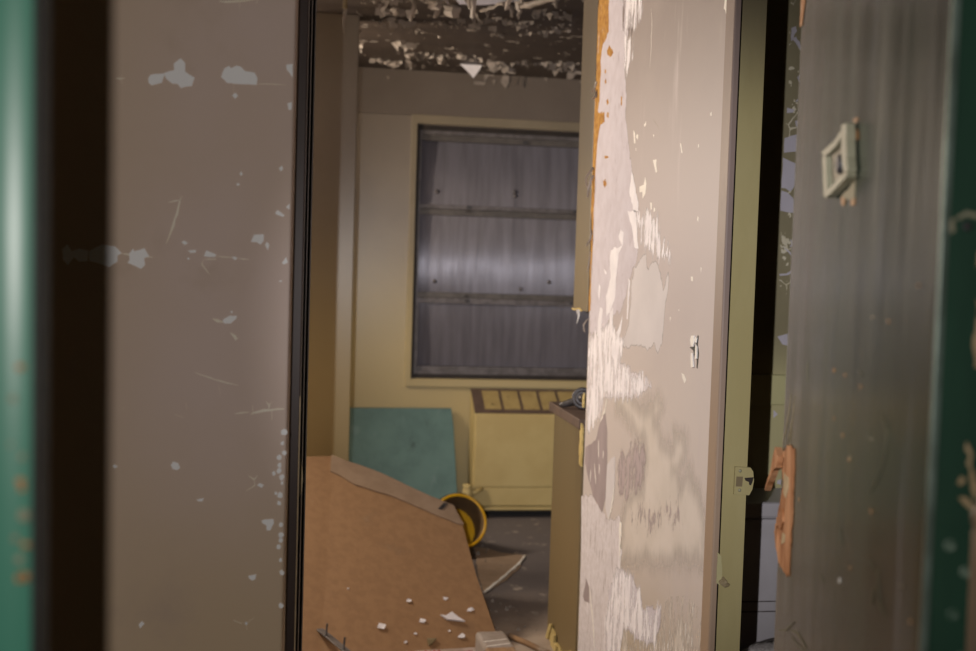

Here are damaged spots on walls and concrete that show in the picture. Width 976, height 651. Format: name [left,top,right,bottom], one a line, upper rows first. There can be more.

peeling [359,0,582,88]
spalling [148,58,194,88]
spalling [221,66,258,99]
peeling [780,99,798,218]
peeling [779,232,792,276]
spalling [957,442,976,510]
peeling [440,612,465,622]